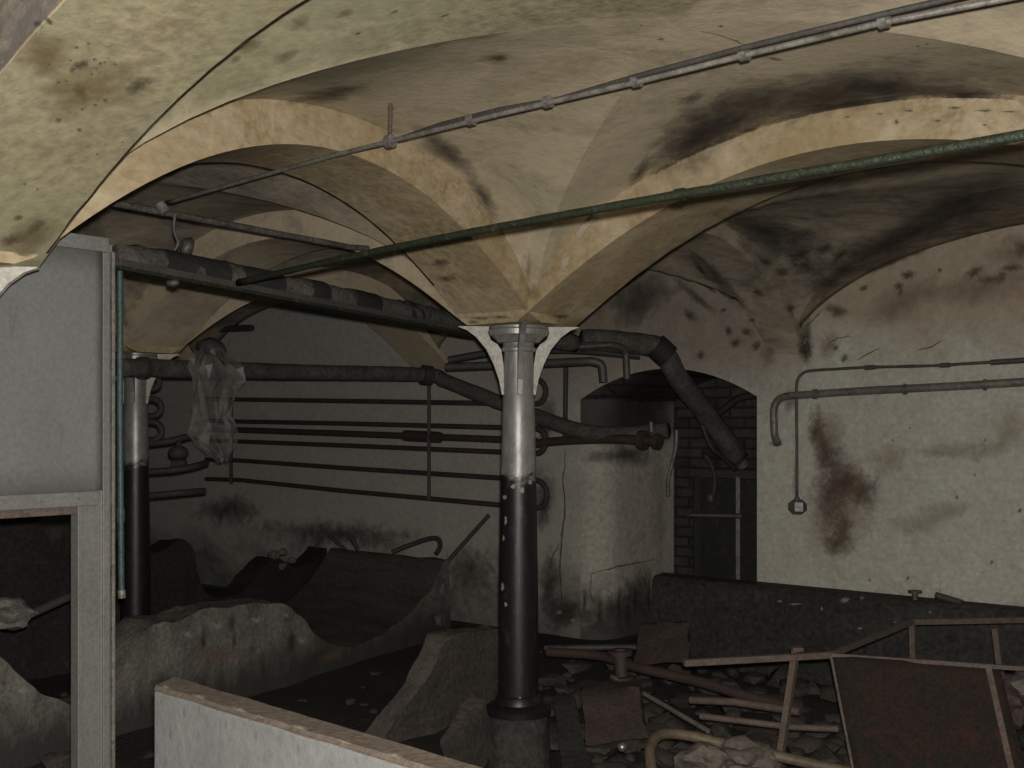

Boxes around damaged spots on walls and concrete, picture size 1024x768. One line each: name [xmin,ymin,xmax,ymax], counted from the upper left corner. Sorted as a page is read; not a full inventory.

crack [548,449,566,628]
crack [589,560,650,605]